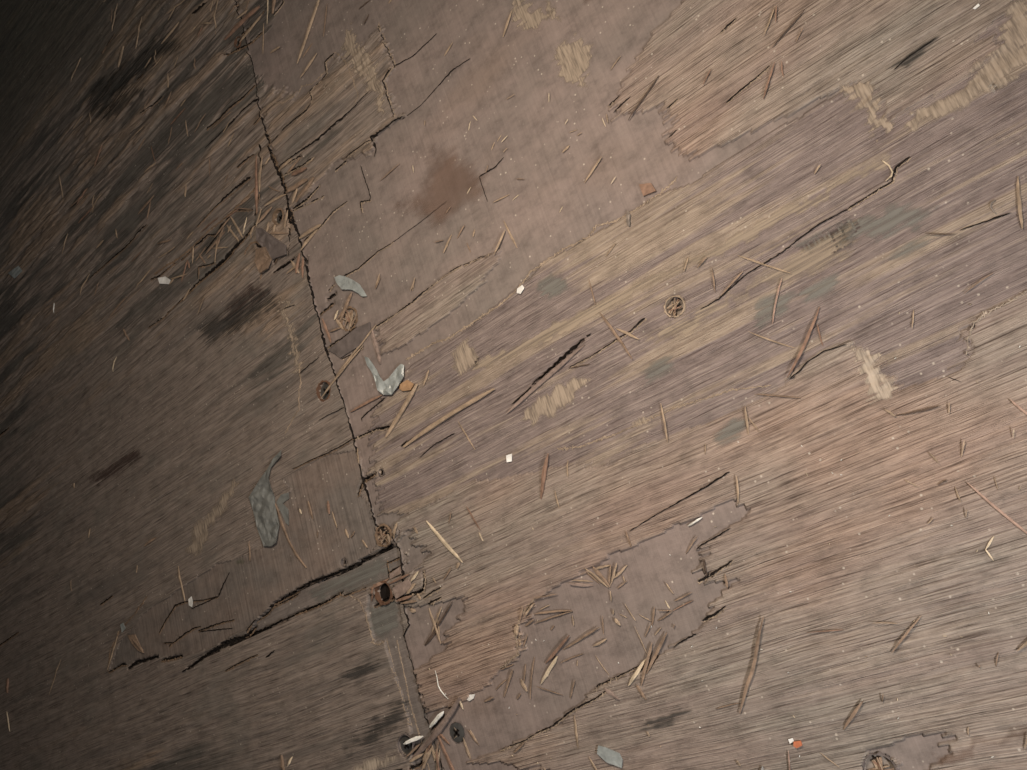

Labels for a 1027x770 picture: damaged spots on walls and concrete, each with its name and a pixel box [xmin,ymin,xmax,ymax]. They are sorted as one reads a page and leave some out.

crack [109,544,442,673]
peeling [111,0,840,770]